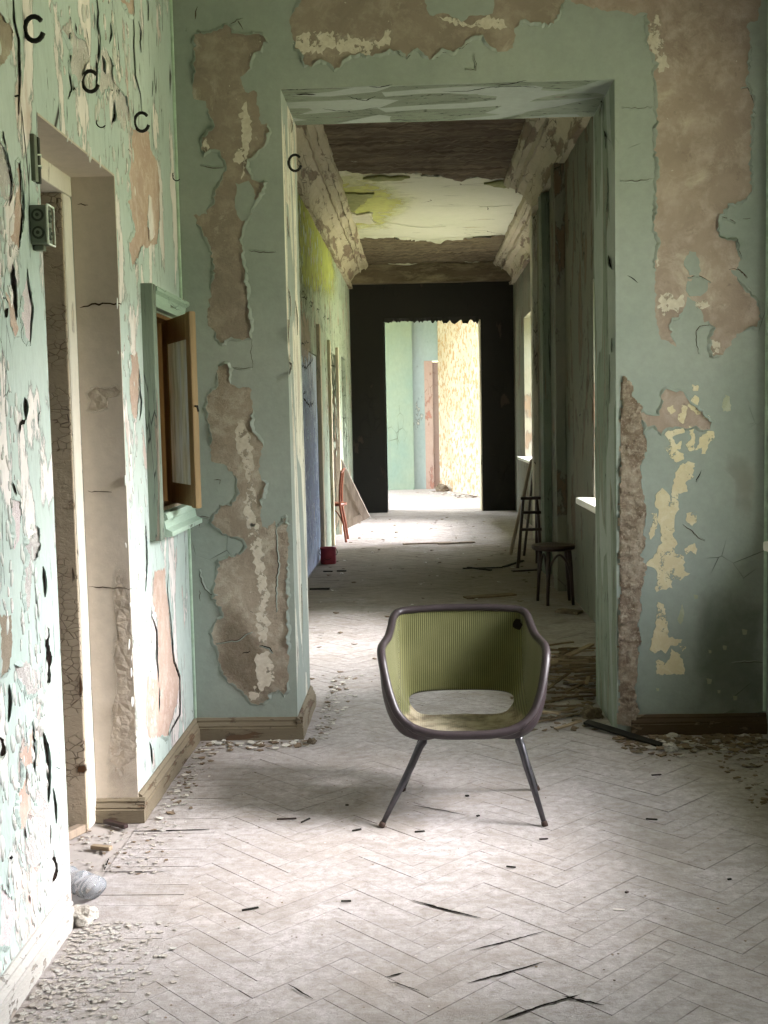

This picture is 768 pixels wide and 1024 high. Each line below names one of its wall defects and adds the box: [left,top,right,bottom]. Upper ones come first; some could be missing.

peeling [0,140,33,346]
peeling [60,0,161,272]
peeling [190,23,272,347]
peeling [289,0,763,359]
peeling [0,385,59,974]
peeling [128,568,179,742]
peeling [202,361,292,706]
flaking render [617,375,713,727]